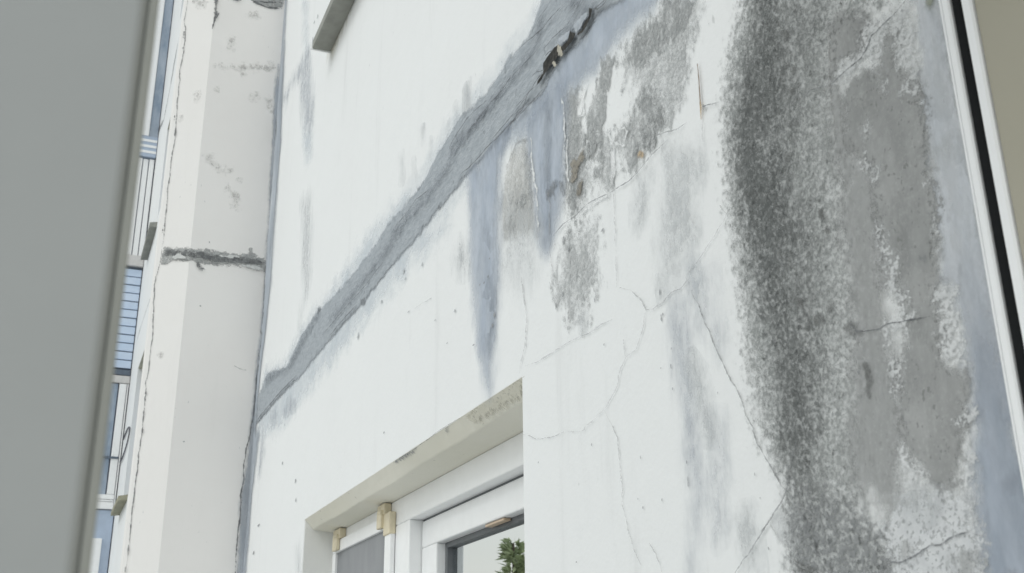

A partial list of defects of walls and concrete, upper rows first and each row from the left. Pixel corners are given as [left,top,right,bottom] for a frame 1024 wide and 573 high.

crack [235,268,295,573]
leakage [503,140,540,239]
leakage [550,218,604,329]
leakage [620,0,699,154]
crack [609,205,817,568]
leakage [717,0,899,573]